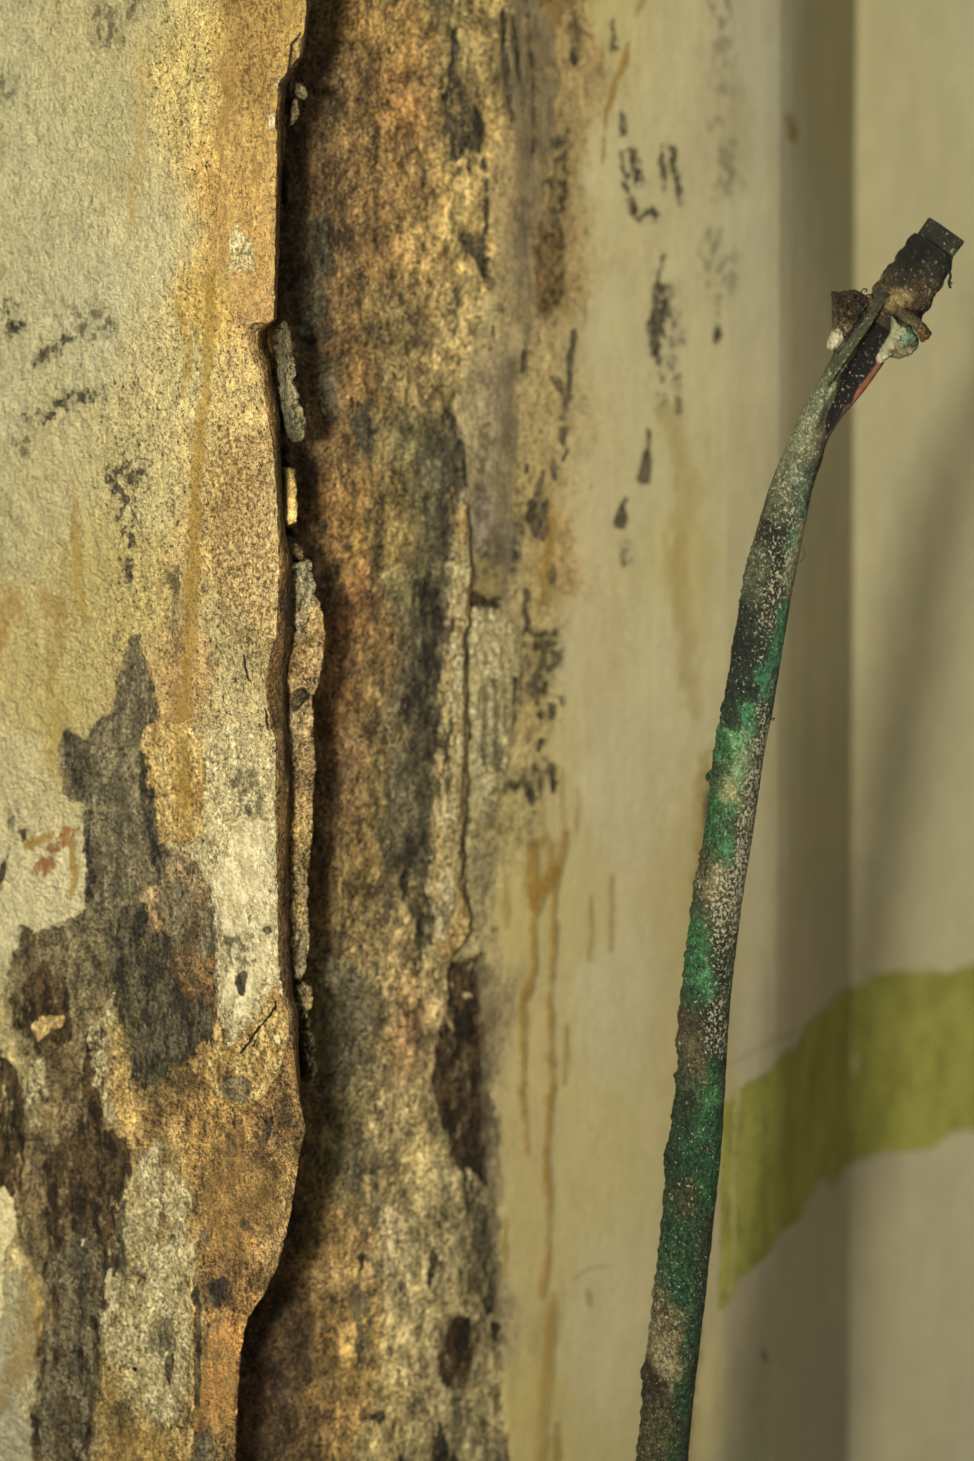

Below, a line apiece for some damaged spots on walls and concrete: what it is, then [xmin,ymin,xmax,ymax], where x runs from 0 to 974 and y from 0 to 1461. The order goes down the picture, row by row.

crack [278,32,301,87]
damp [429,0,495,290]
mould [619,111,683,224]
mould [11,386,107,458]
mould [31,308,116,374]
damp [200,424,277,688]
damp [377,127,578,978]
mould [646,254,684,414]
flaking render [0,0,511,1461]
peeling [467,590,521,827]
damp [99,722,281,1090]
damp [430,955,504,1461]